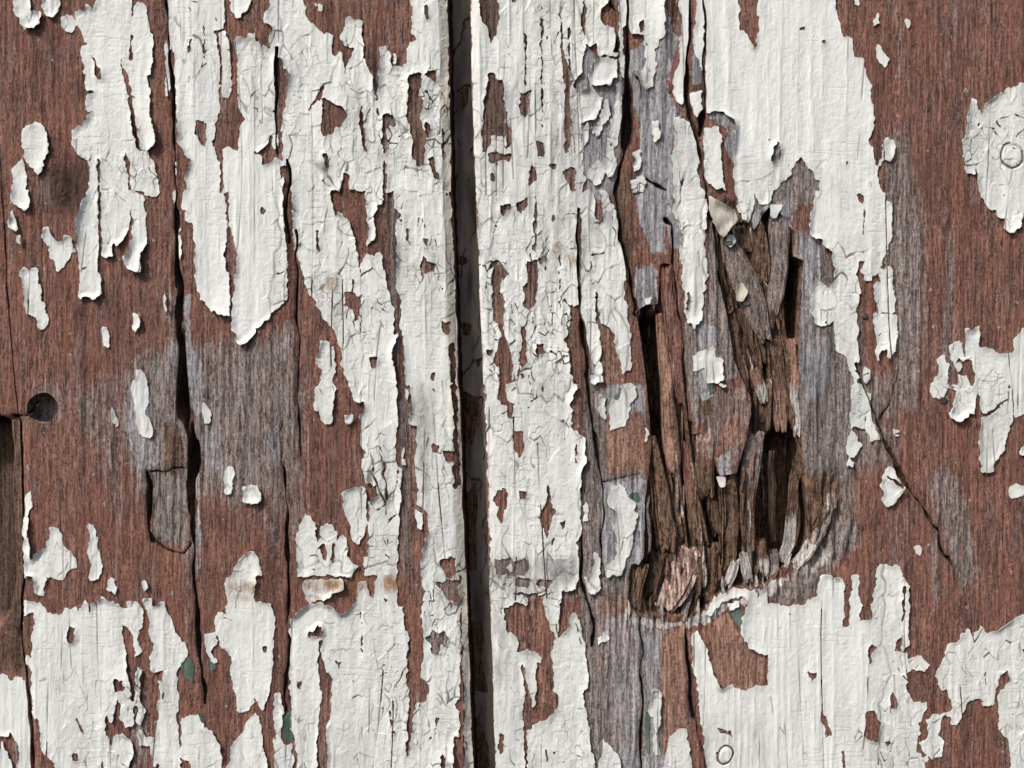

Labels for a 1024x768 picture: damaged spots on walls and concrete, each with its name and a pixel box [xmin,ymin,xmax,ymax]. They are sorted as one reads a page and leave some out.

peeling [7,0,160,300]
peeling [19,267,49,330]
peeling [100,327,110,348]
peeling [132,313,140,332]
peeling [131,369,153,438]
crack [146,0,207,703]
peeling [164,0,666,768]
crack [576,209,626,646]
crack [663,218,696,458]
spalling [584,0,1024,768]
crack [854,363,952,565]
peeling [0,491,268,768]